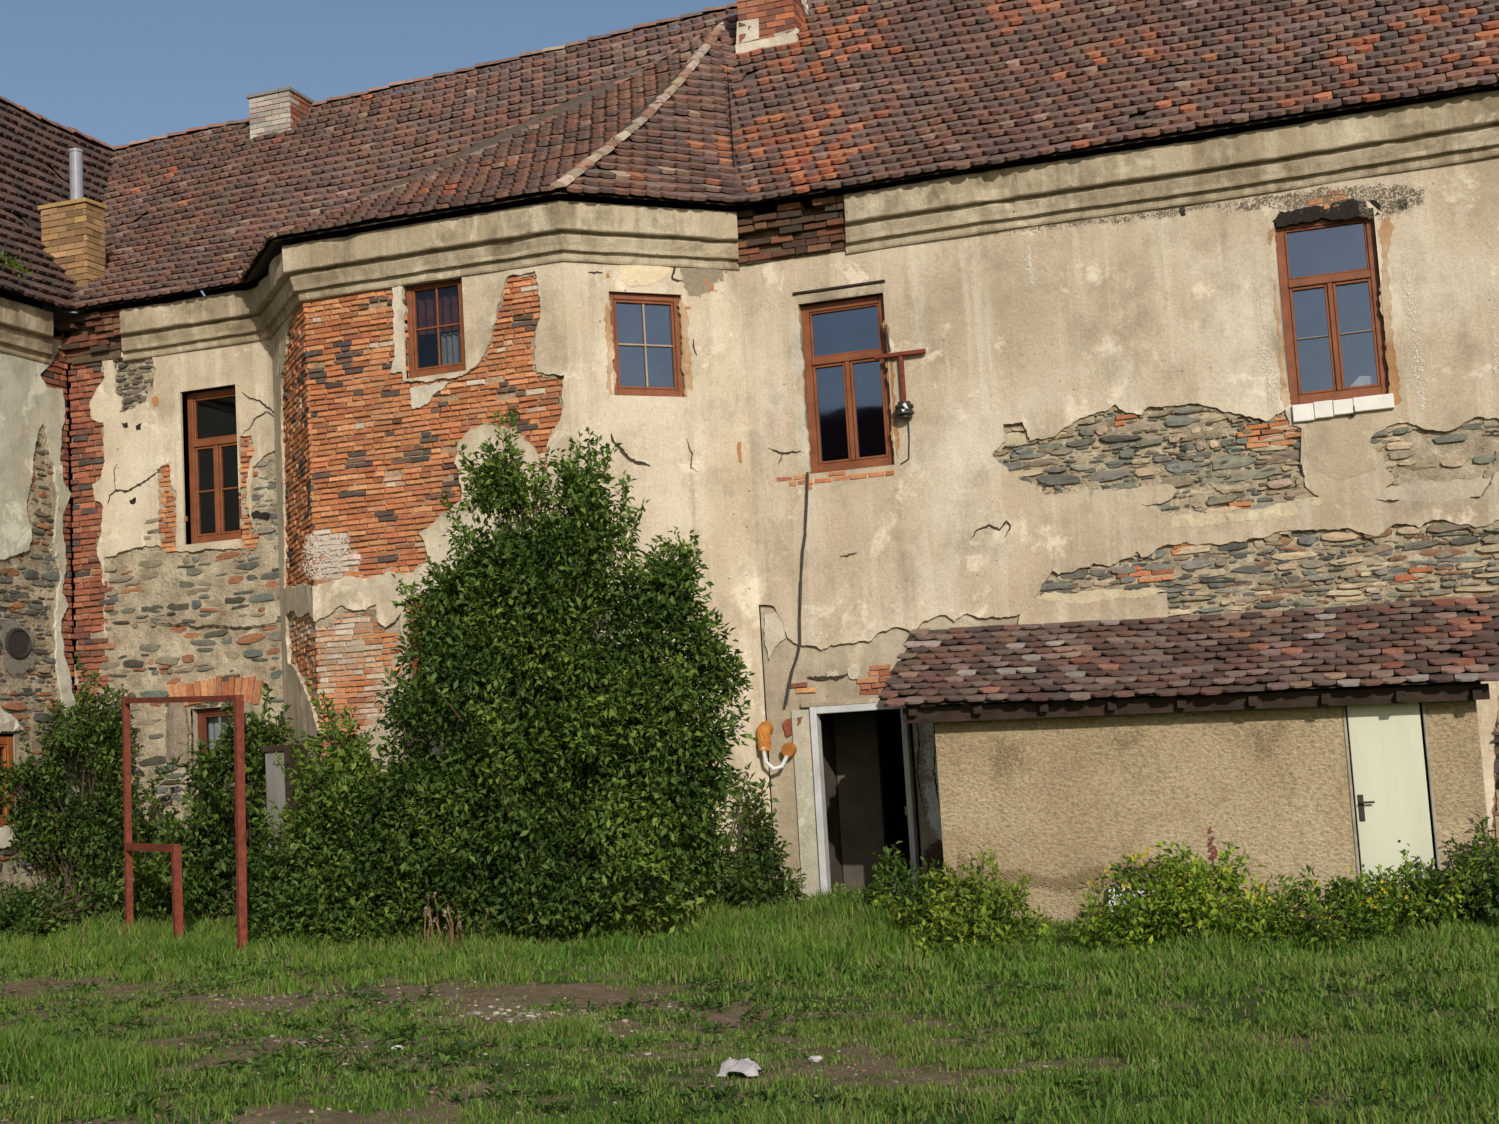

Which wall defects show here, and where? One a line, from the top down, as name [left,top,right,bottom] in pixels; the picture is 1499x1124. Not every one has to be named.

crack [107,464,160,505]
crack [242,392,274,434]
flaking render [0,272,564,918]
peeling [760,605,1020,905]
spalling [1490,696,1499,873]
peeling [145,978,871,1122]